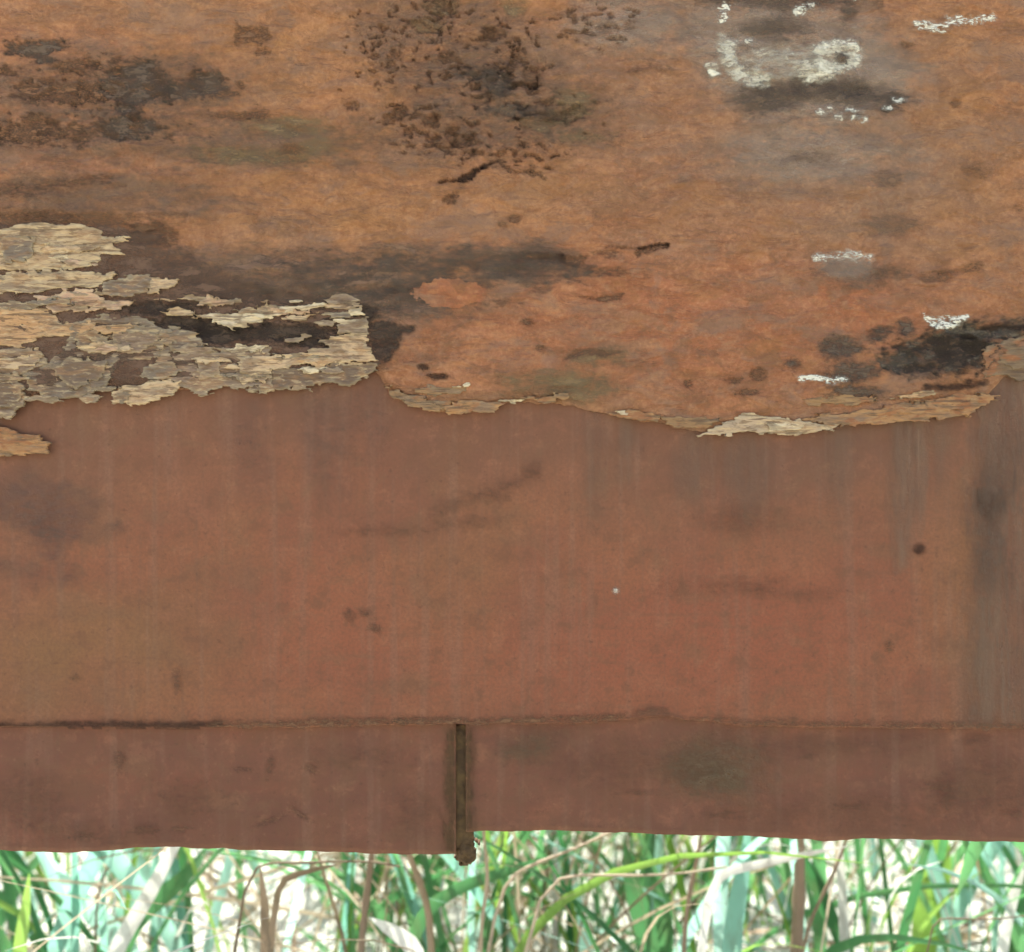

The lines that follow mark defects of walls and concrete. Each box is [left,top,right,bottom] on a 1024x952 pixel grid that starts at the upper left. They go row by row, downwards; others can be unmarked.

damp [685,0,914,181]
damp [0,176,594,396]
peeling [0,222,379,420]
peeling [981,335,1024,381]
peeling [383,364,569,415]
peeling [609,390,1000,437]
rust [924,381,986,390]
rust [0,426,52,457]